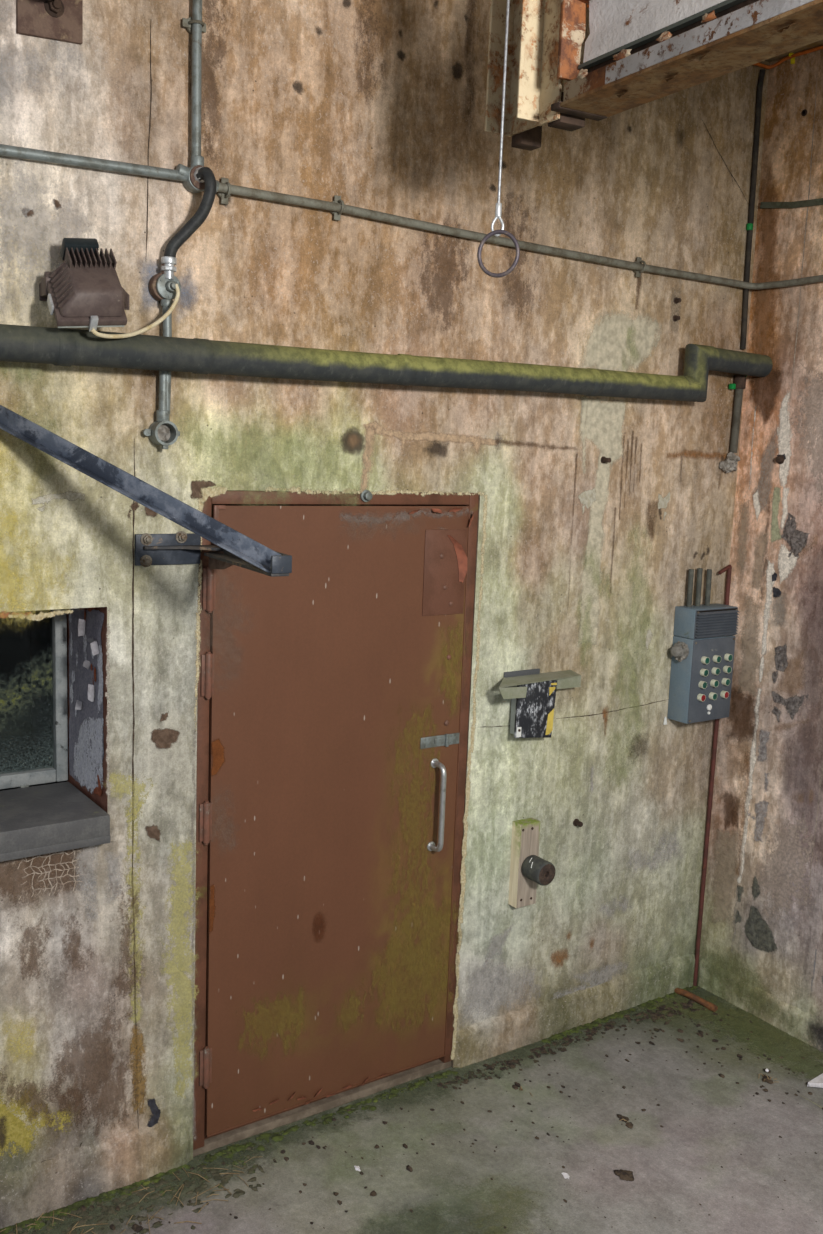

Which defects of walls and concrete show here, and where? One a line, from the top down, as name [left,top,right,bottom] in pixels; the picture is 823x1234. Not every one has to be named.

spalling [781,512,810,557]
spalling [772,573,781,598]
peeling [0,607,111,797]
spalling [772,644,808,722]
spalling [747,730,769,842]
damp [21,926,49,978]
damp [64,922,89,969]
damp [115,888,138,994]
spalling [735,877,777,953]